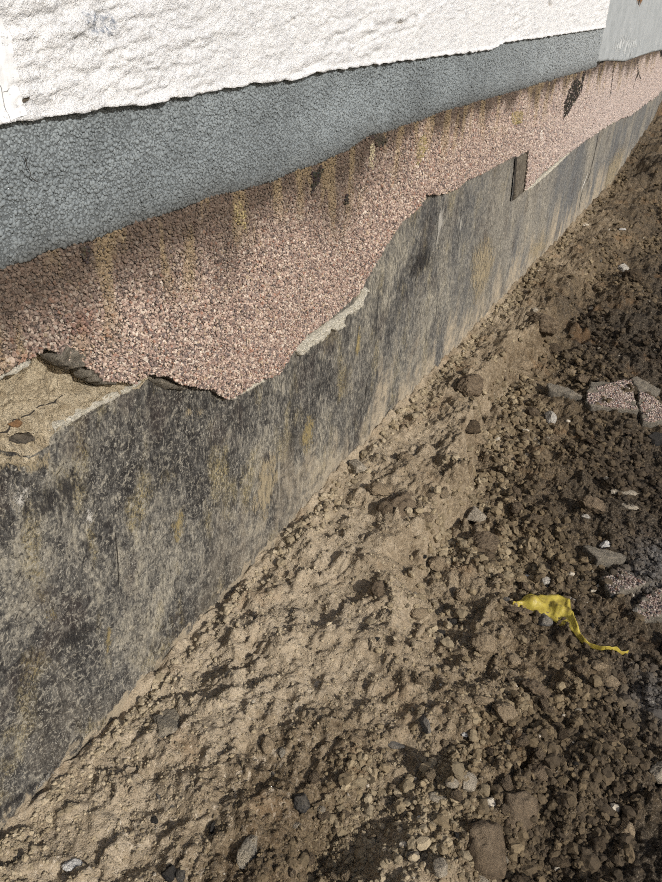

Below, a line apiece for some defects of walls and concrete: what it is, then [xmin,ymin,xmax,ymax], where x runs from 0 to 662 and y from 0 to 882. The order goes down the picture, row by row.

leakage [563,70,586,120]
spalling [295,287,371,356]
spalling [0,345,189,467]